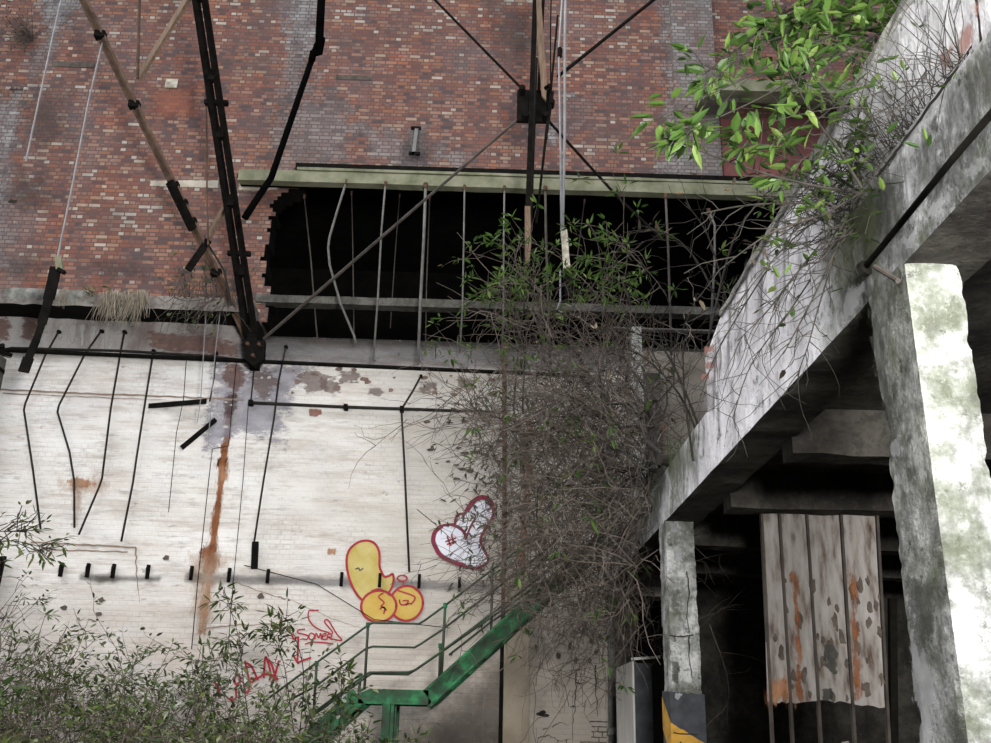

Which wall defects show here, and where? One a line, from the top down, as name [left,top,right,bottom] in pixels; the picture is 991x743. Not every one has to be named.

peeling [148,331,396,451]
peeling [419,373,497,409]
peeling [435,439,499,480]
rust [67,478,95,487]
rust [198,393,237,635]